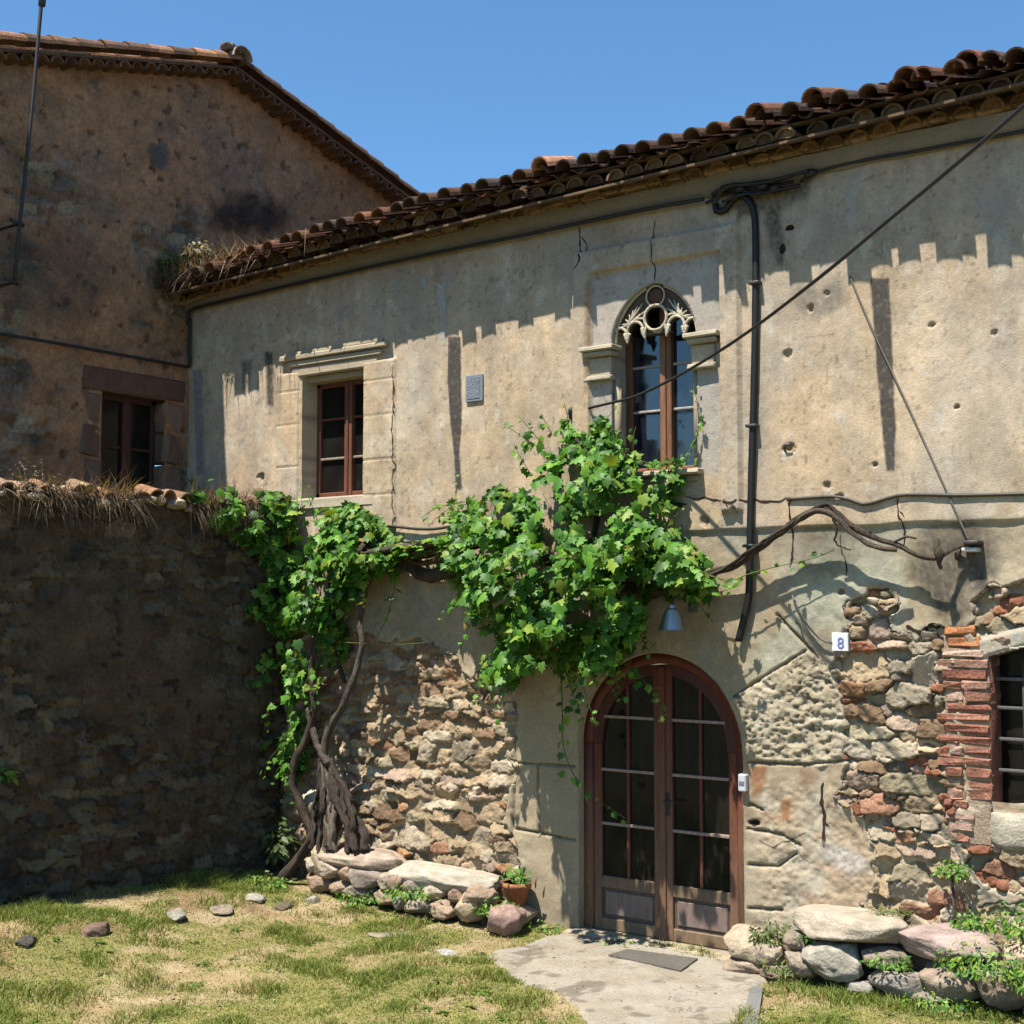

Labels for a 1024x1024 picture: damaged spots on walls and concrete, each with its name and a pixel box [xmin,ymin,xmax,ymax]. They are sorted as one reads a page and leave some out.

crack [573,226,587,270]
crack [649,221,657,281]
flaking render [280,625,521,880]
flaking render [831,581,1024,926]
crack [760,783,829,863]